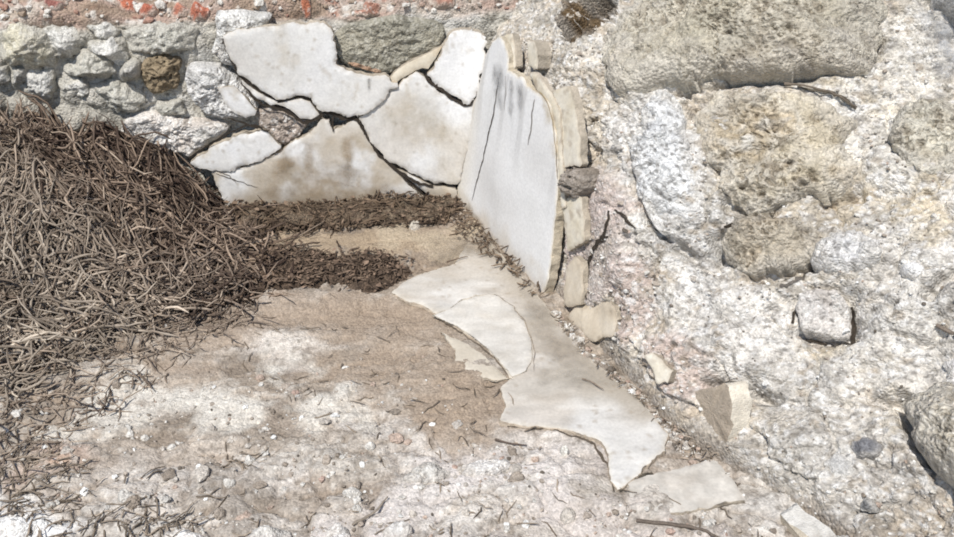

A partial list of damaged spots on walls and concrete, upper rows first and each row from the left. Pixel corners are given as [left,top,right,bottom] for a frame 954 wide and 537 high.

crack [189,39,434,196]
crack [424,74,506,198]
crack [528,92,558,179]